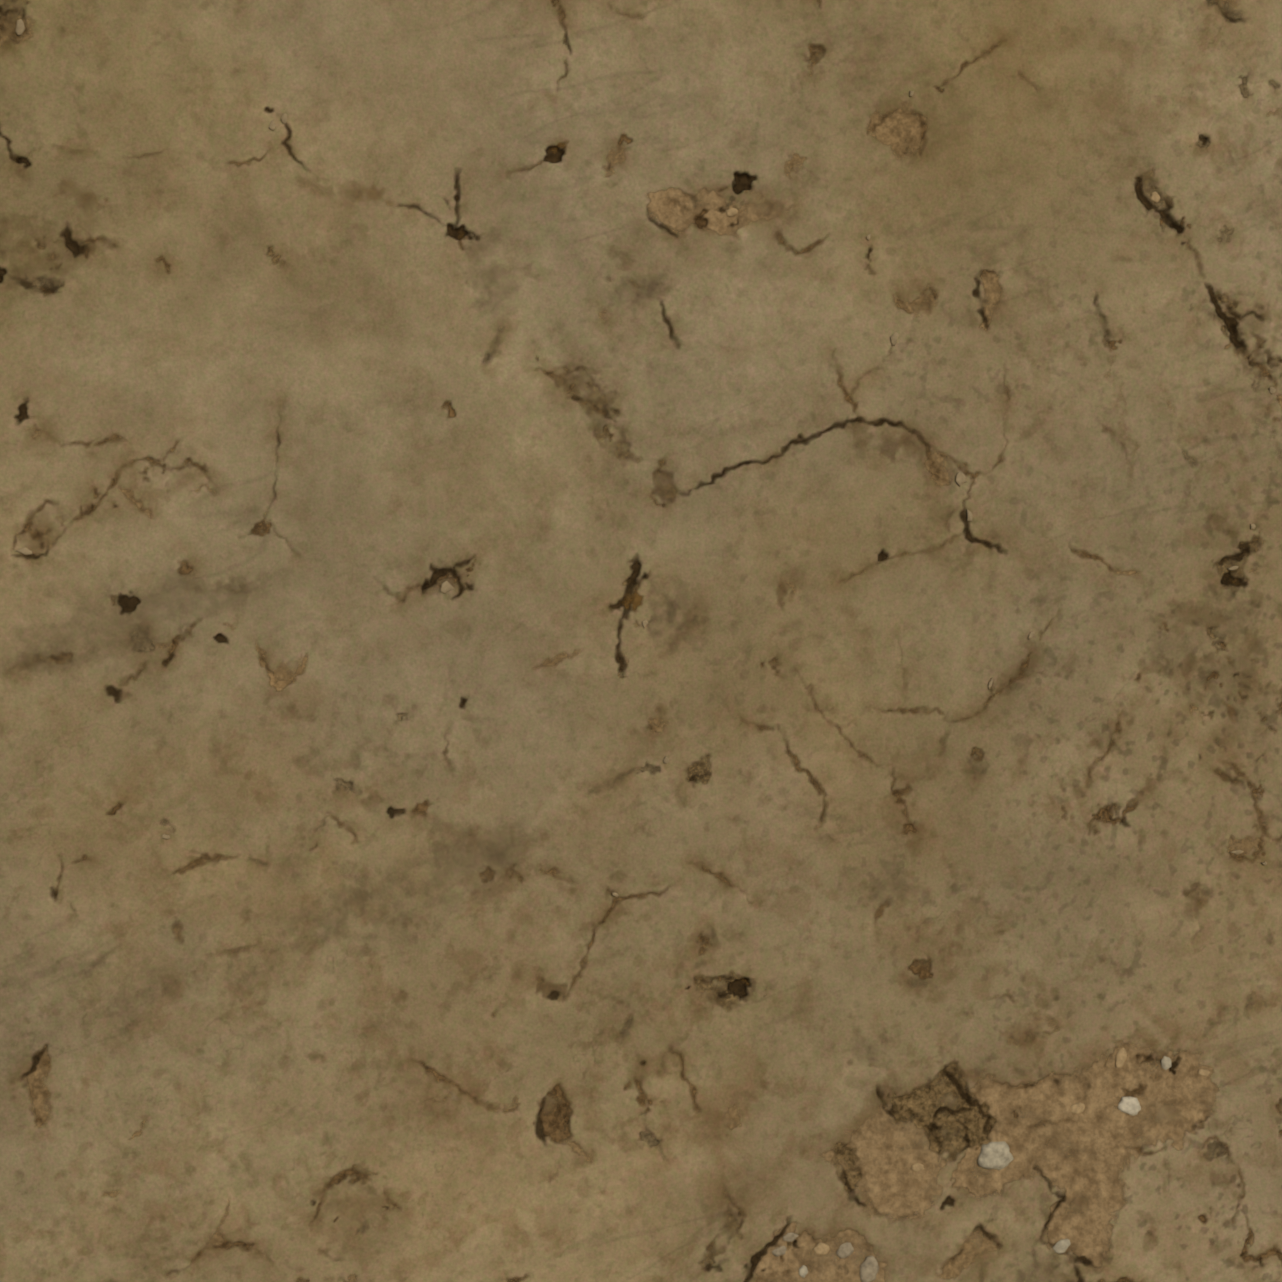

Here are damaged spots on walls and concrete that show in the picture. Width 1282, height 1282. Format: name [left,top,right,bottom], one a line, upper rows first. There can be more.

crack [230,107,302,165]
crack [409,174,479,249]
spalling [647,172,791,236]
spalling [779,235,822,254]
crack [16,435,212,558]
crack [698,376,1002,552]
crack [422,560,474,598]
crack [878,550,889,562]
crack [609,559,648,676]
spalling [533,1085,590,1161]
spalling [822,1041,1219,1282]
spalling [745,1222,888,1282]